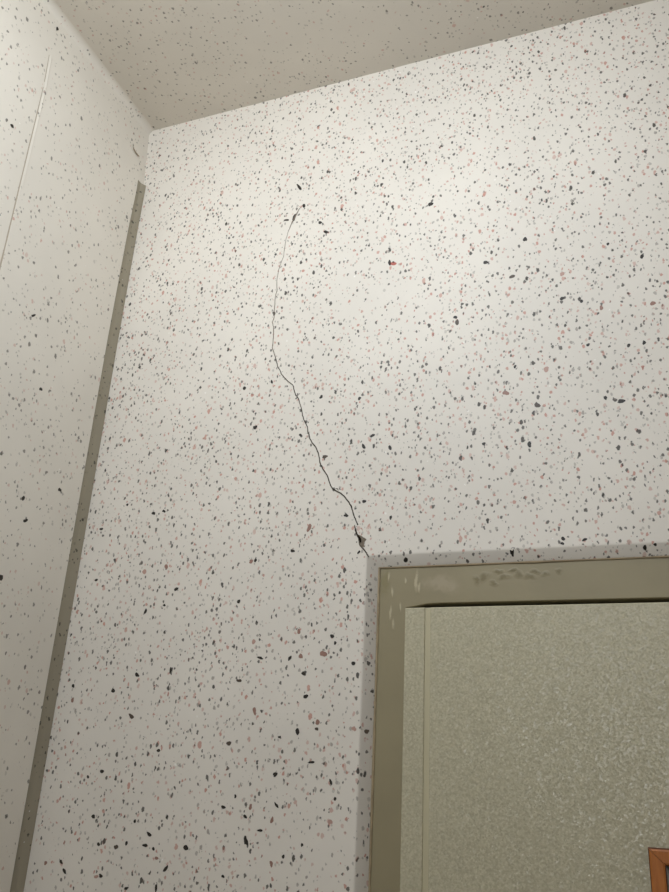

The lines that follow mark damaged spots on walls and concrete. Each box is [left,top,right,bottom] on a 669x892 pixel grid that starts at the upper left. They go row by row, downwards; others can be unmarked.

crack [272,207,369,557]